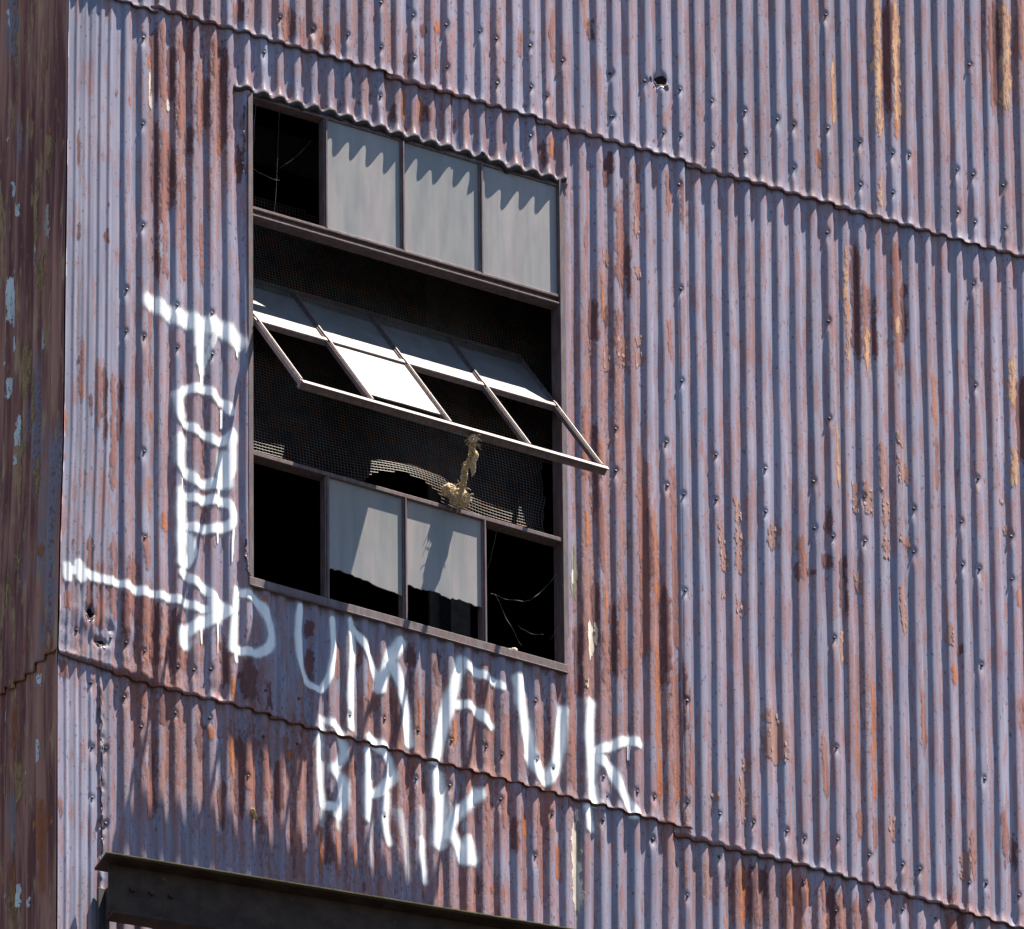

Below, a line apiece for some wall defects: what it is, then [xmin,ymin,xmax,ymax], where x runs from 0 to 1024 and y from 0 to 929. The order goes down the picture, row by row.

corrosion [868,0,903,141]
peeling [5,270,16,351]
corrosion [587,163,643,372]
corrosion [841,238,909,376]
peeling [13,414,21,465]
peeling [851,430,916,559]
corrosion [553,404,694,805]
peeling [853,568,863,595]
peeling [899,583,908,634]
corrosion [219,634,273,710]
corrosion [217,728,293,831]
peeling [760,707,793,771]